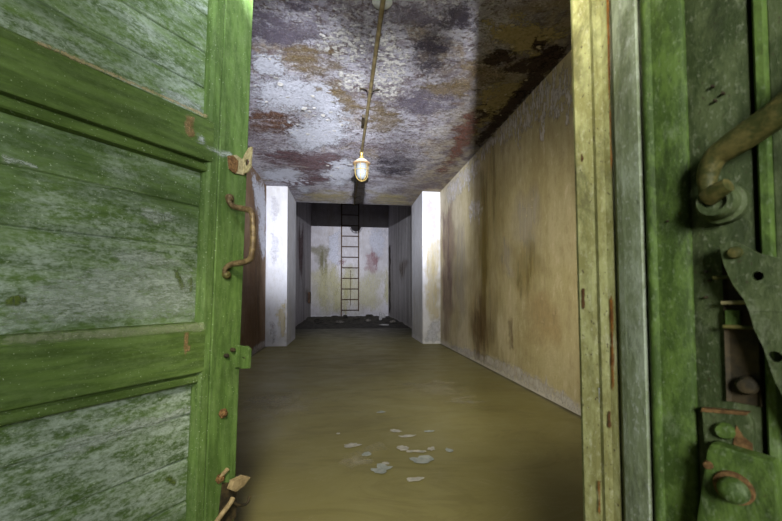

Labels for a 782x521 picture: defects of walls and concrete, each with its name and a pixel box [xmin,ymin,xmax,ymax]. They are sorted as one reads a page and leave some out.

corrosion [248,108,304,136]
water stain [446,35,573,203]
corrosion [248,147,350,187]